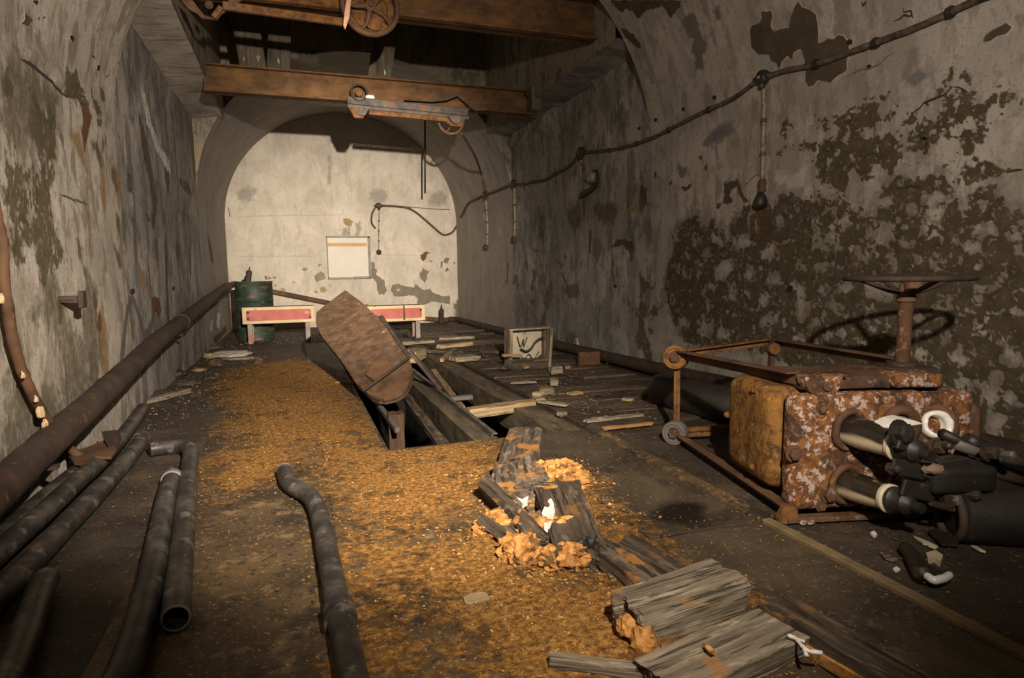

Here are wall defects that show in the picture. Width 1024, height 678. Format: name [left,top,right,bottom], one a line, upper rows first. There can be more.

peeling [749,0,851,88]
peeling [983,22,1014,44]
crack [22,59,70,98]
damp [92,137,132,193]
damp [0,60,105,418]
peeling [371,258,455,305]